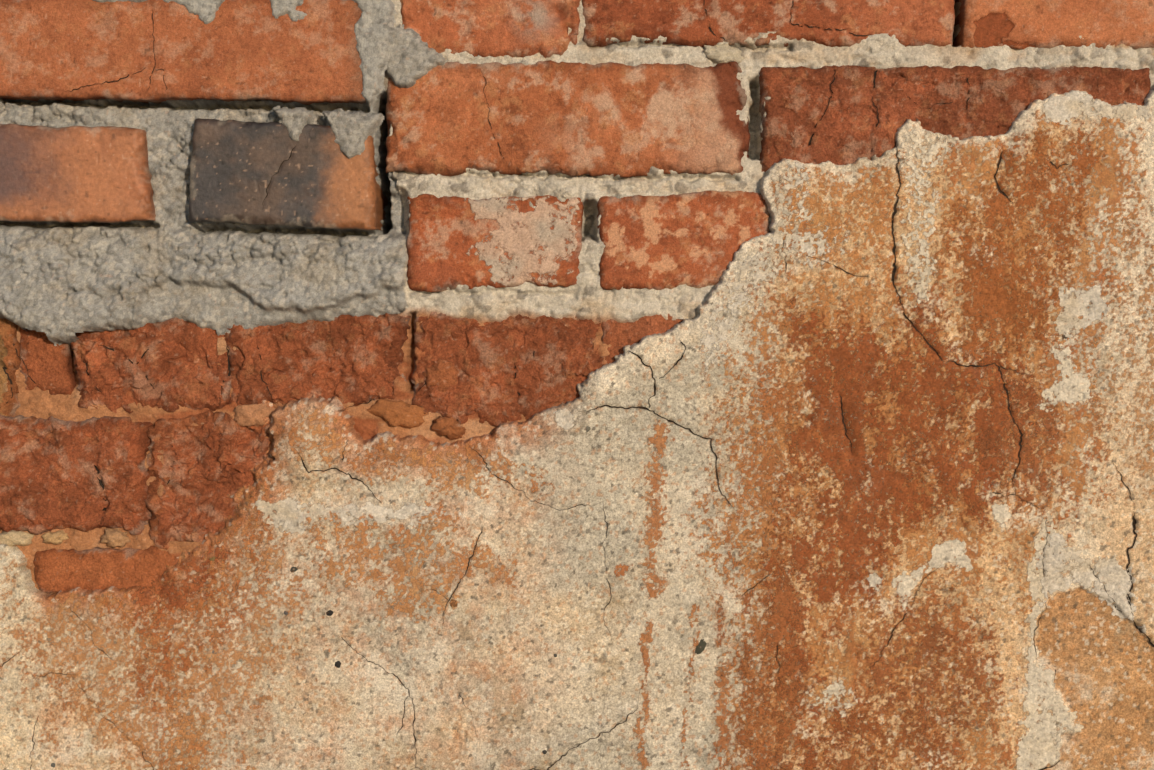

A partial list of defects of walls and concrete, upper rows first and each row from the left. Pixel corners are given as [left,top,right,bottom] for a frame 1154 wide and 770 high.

spalling [974,12,1037,49]
corrosion [0,405,554,770]
crack [341,637,420,770]
spalling [0,70,1154,611]
crack [530,691,640,770]
corrosion [633,621,653,770]
corrosion [614,420,675,598]
crack [579,342,731,505]
crack [871,566,940,667]
crack [781,70,1048,574]
corrosion [680,110,1154,770]
crack [1089,463,1154,647]